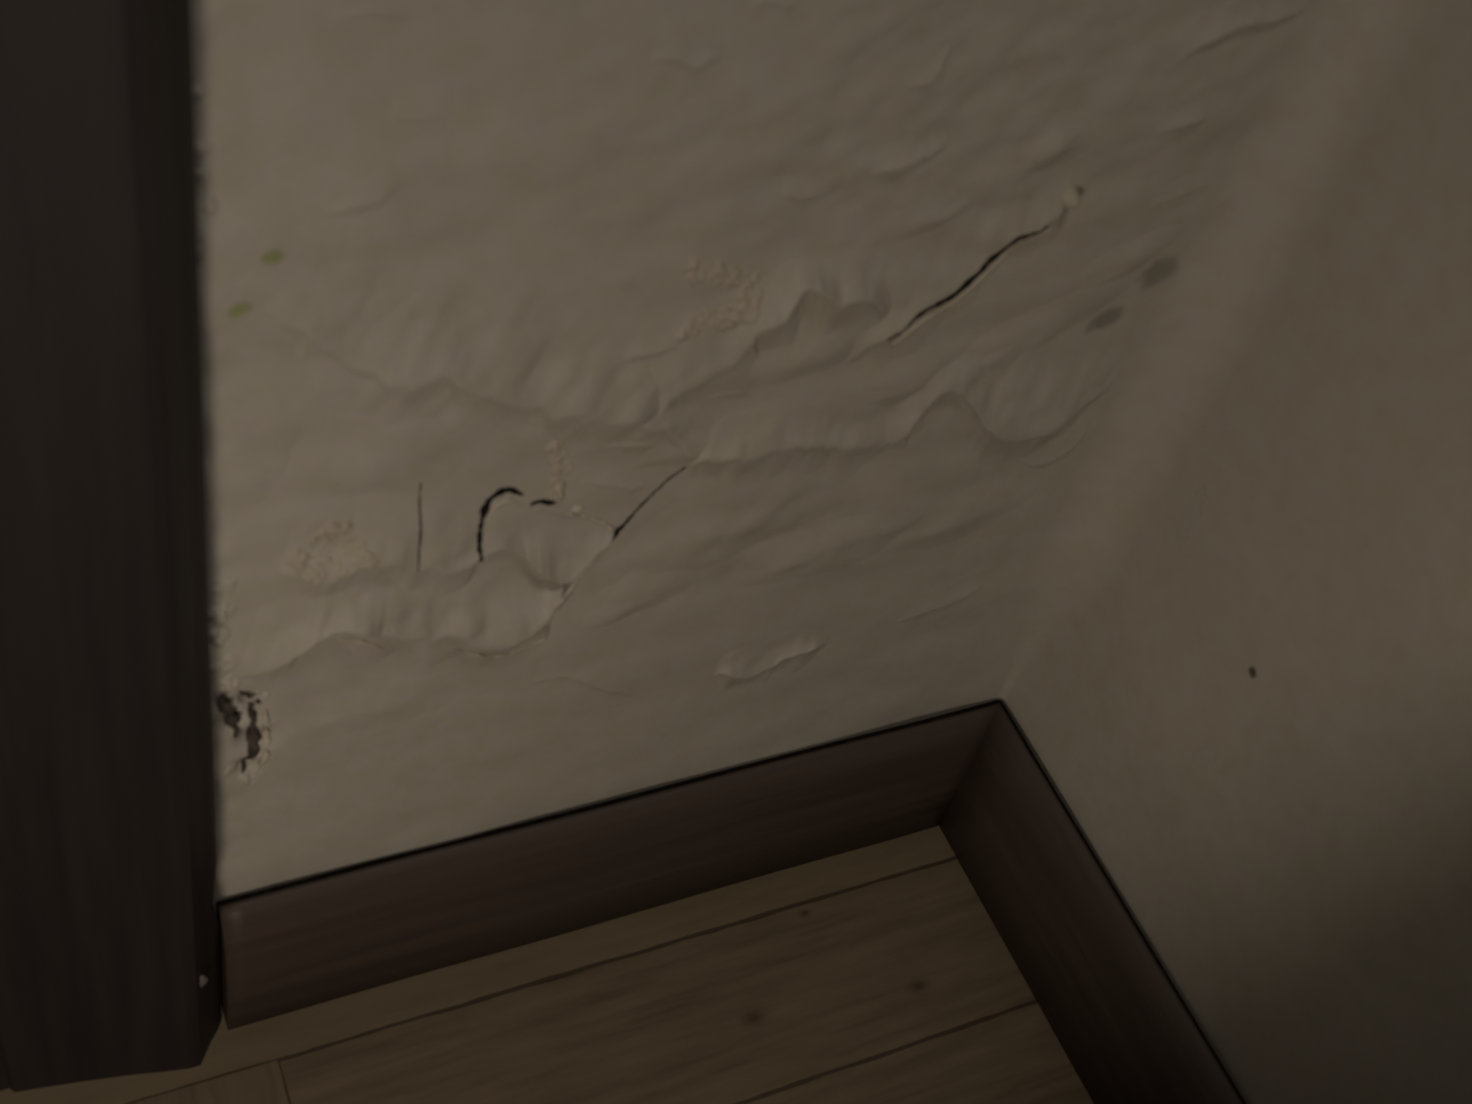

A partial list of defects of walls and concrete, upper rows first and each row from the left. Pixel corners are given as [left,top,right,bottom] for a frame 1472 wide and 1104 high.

peeling [846,167,1075,365]
crack [888,226,1052,345]
crack [477,485,556,562]
crack [548,467,686,627]
peeling [209,489,616,785]